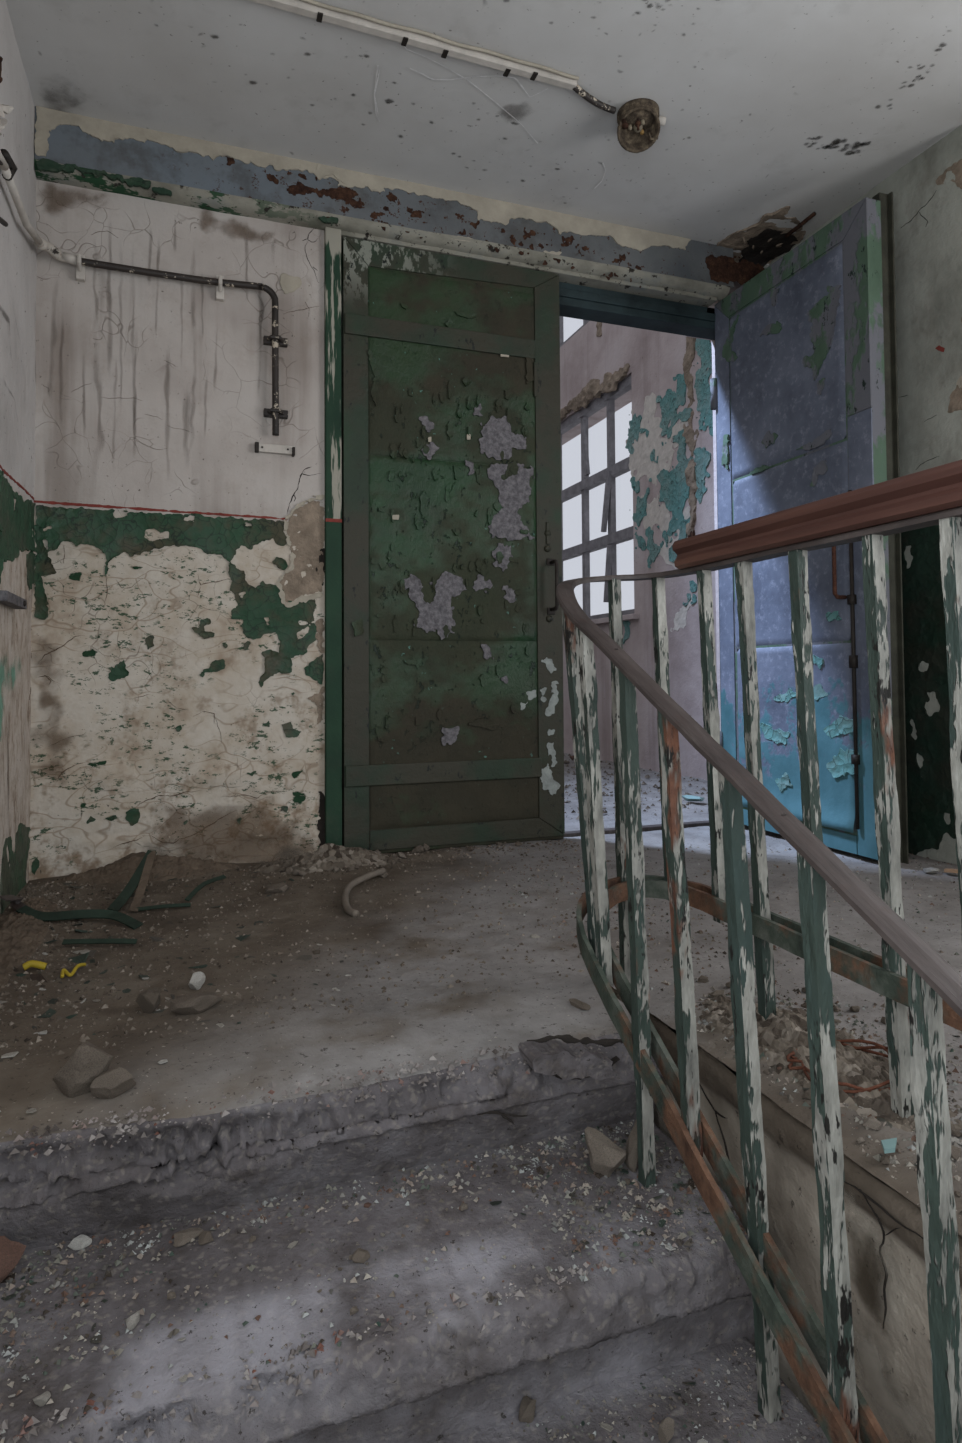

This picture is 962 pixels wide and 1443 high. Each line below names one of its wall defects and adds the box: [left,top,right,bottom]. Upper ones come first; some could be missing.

corrosion [266,173,430,239]
peeling [34,106,691,255]
corrosion [455,213,589,269]
corrosion [603,252,642,288]
spalling [717,206,816,267]
peeling [625,294,740,569]
peeling [404,404,535,640]
peeling [0,470,325,724]
peeling [0,823,40,914]
damp [168,811,310,863]
crack [699,1083,730,1161]
crack [844,1181,924,1329]